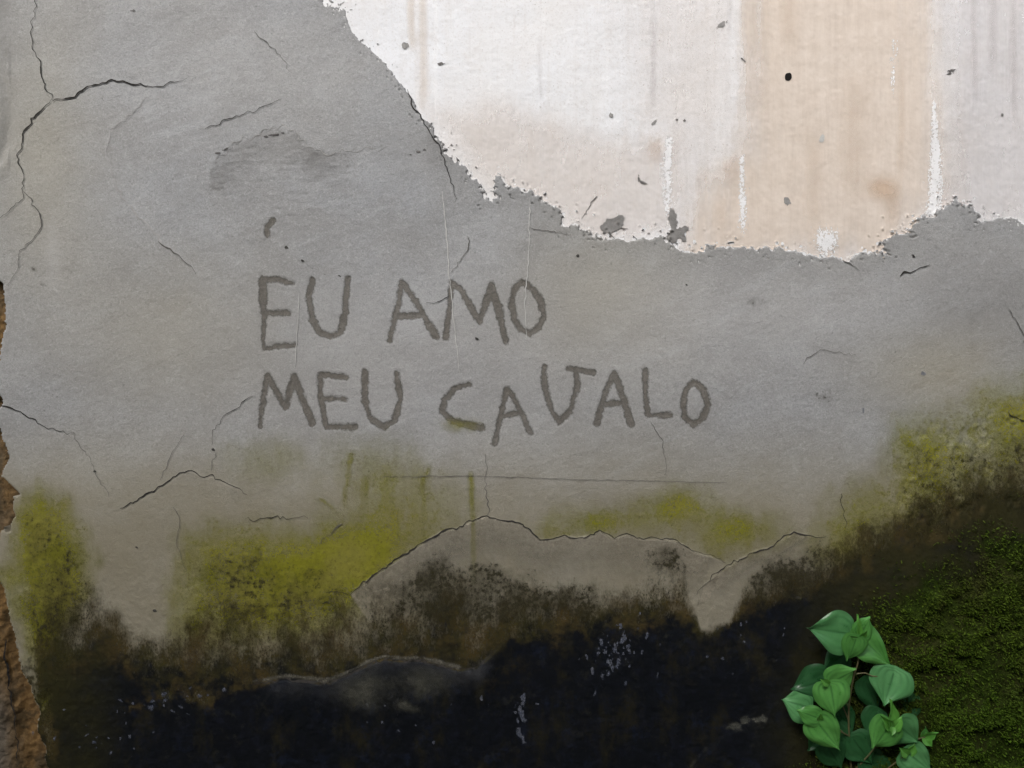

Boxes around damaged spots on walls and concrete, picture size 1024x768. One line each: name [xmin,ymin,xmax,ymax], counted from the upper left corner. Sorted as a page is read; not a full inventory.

crack [0,0,185,284]
crack [407,89,457,199]
water stain [693,0,946,258]
spalling [0,428,20,533]
spalling [0,582,49,768]
crack [0,396,306,522]
water stain [21,443,1024,768]
crack [322,454,847,619]